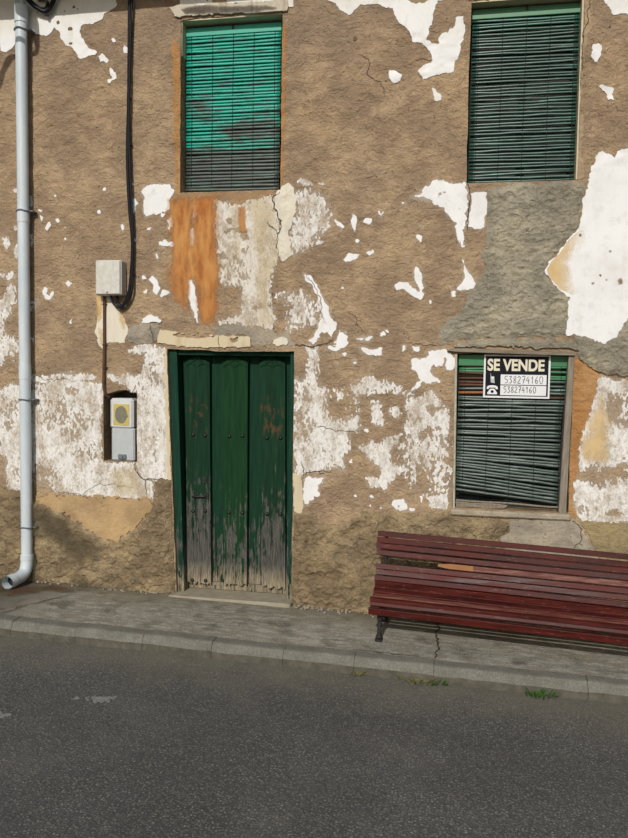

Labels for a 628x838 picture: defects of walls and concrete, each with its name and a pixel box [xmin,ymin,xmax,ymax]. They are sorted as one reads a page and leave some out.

flaking render [25,0,117,83]
flaking render [170,0,294,18]
flaking render [328,0,465,80]
spalling [132,41,181,230]
rust [169,197,219,323]
flaking render [289,178,384,255]
flaking render [415,180,487,248]
flaking render [545,148,628,344]
spalling [25,195,510,613]
spalling [0,383,21,578]
flaking render [569,357,628,602]
crack [363,622,440,658]